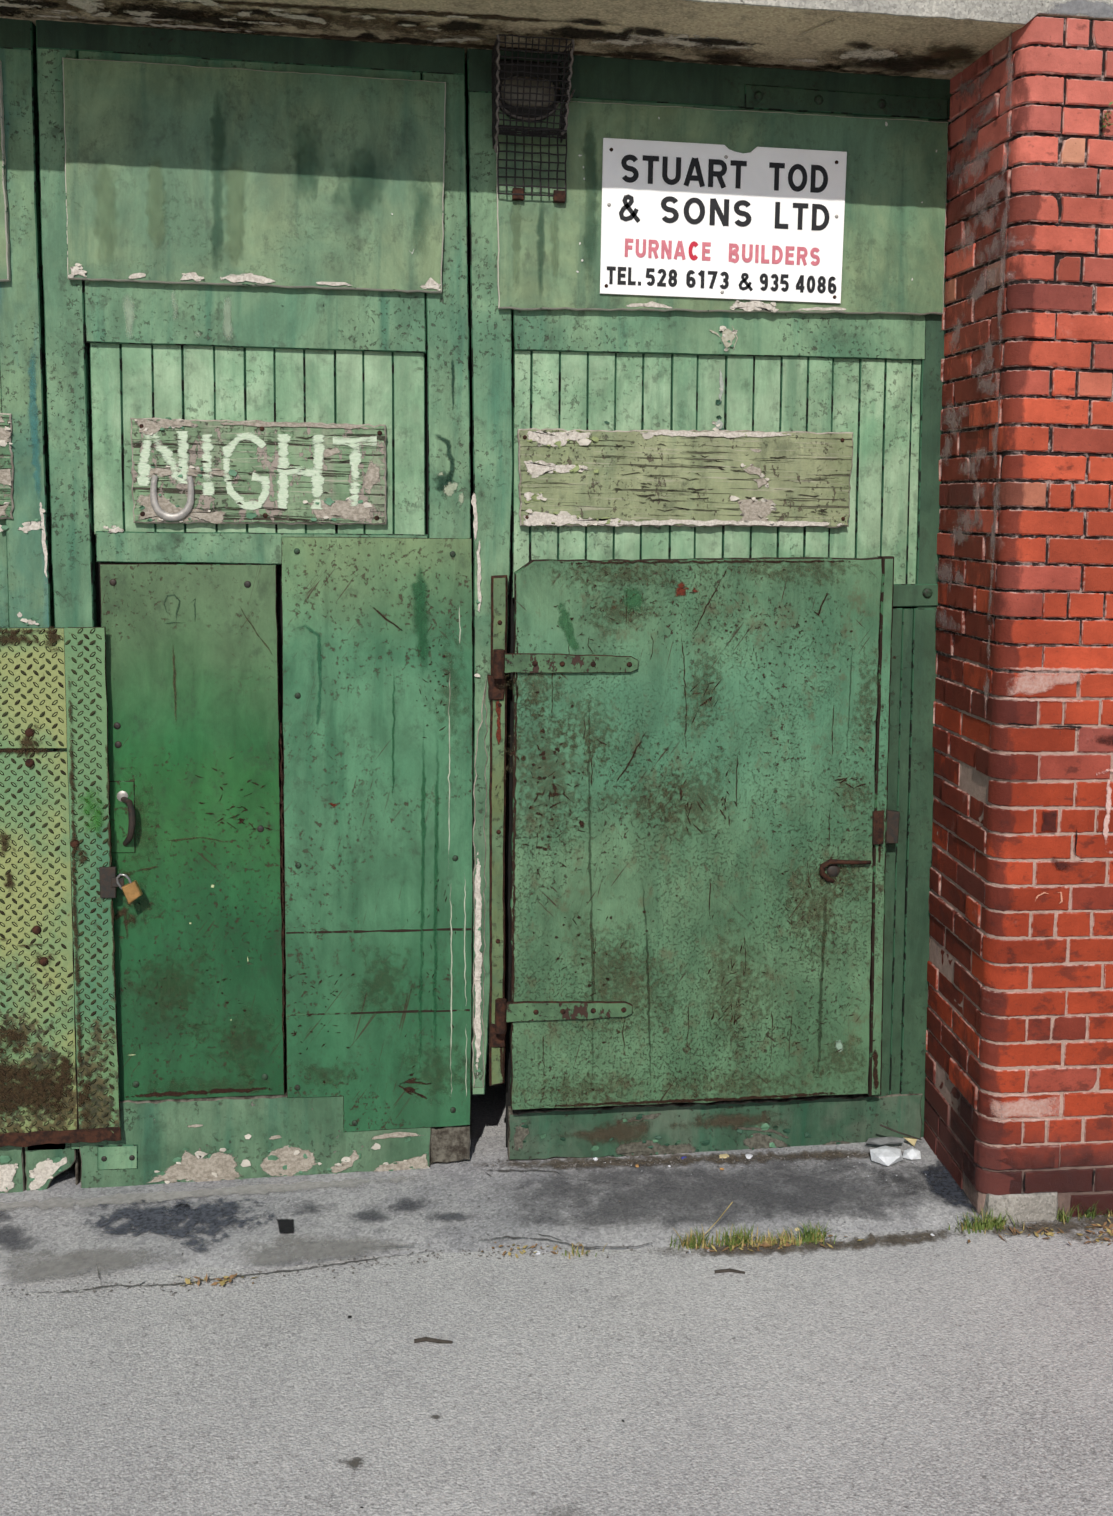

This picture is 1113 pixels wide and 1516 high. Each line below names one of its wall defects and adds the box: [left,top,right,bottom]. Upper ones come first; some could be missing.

damp [142,0,562,22]
damp [61,18,895,76]
peeling [710,300,779,351]
peeling [0,469,48,577]
peeling [303,461,380,521]
peeling [523,369,842,527]
rust [495,673,585,1002]
rust [0,677,92,1131]
rust [533,902,623,996]
rust [555,993,845,1108]
peeling [0,1155,67,1192]
peeling [148,1132,430,1184]